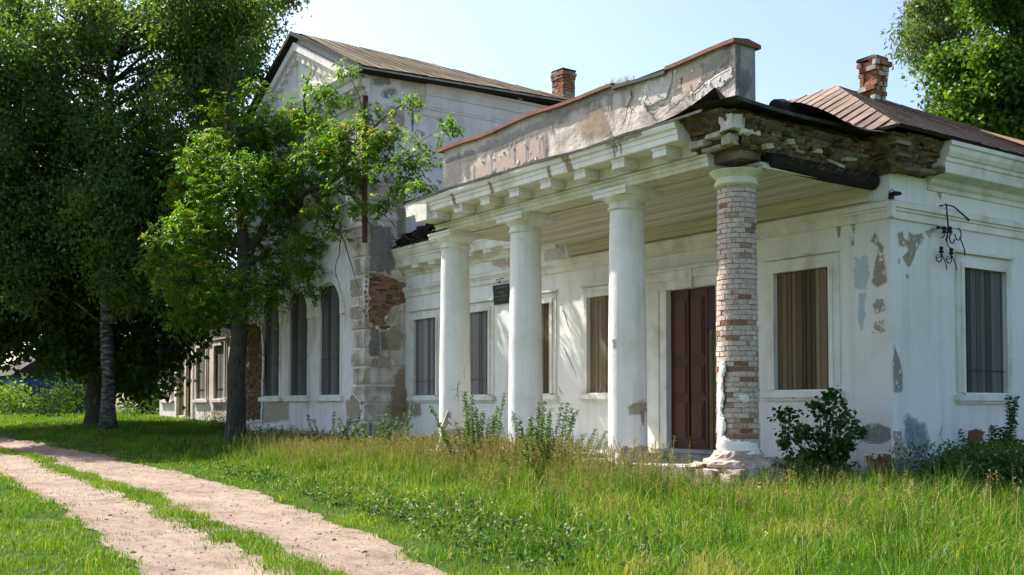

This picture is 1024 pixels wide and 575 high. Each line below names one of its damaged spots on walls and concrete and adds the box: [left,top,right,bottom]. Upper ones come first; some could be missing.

crack [619,75,690,130]
spalling [639,62,907,174]
peeling [470,135,547,181]
peeling [870,226,937,334]
spalling [349,270,406,370]
flaking render [891,344,903,393]
spalling [863,429,914,478]
spalling [965,427,986,447]